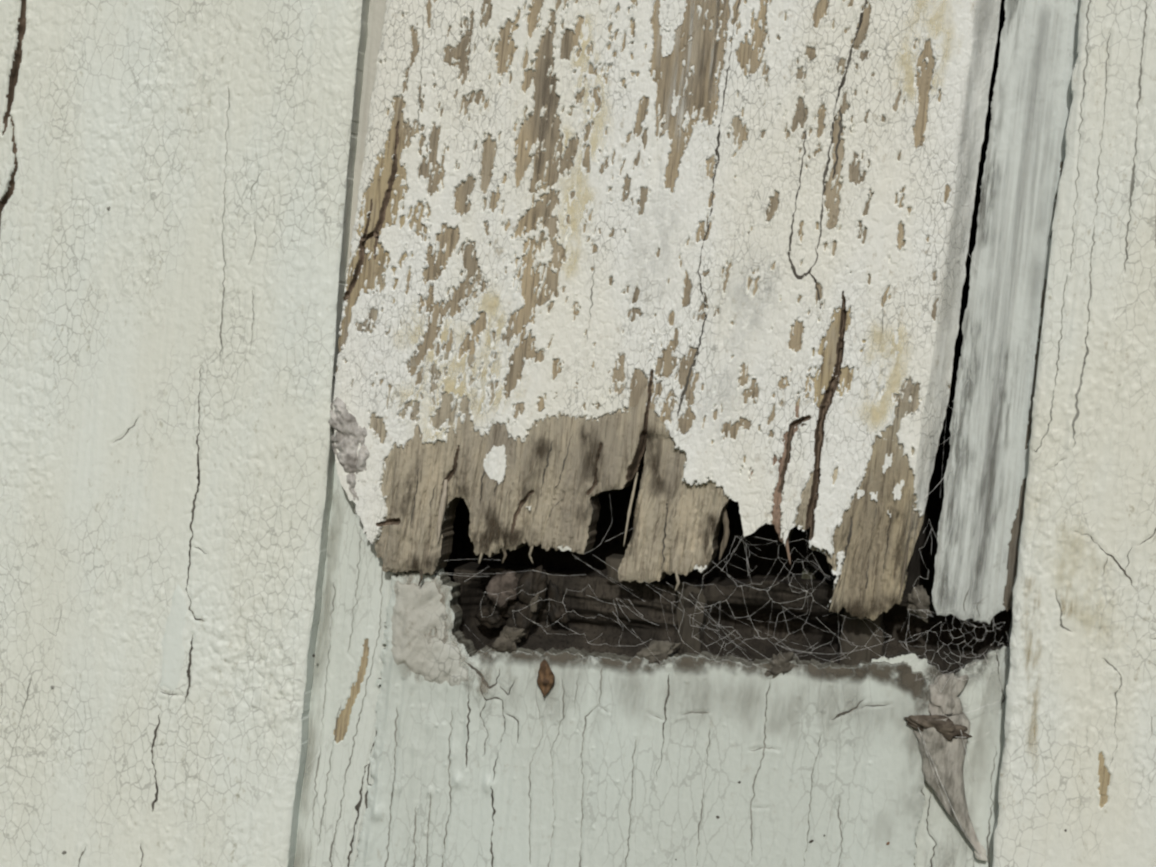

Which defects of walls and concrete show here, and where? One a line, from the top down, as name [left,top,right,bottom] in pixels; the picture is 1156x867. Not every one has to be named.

peeling [328,0,858,583]
peeling [813,0,872,75]
peeling [785,39,941,258]
crack [1034,0,1111,467]
crack [1124,3,1156,271]
peeling [811,377,924,621]
crack [1076,528,1156,585]
peeling [333,639,369,744]
crack [308,534,610,867]
crack [625,675,710,866]
crack [750,685,775,855]
peeling [1098,752,1111,808]